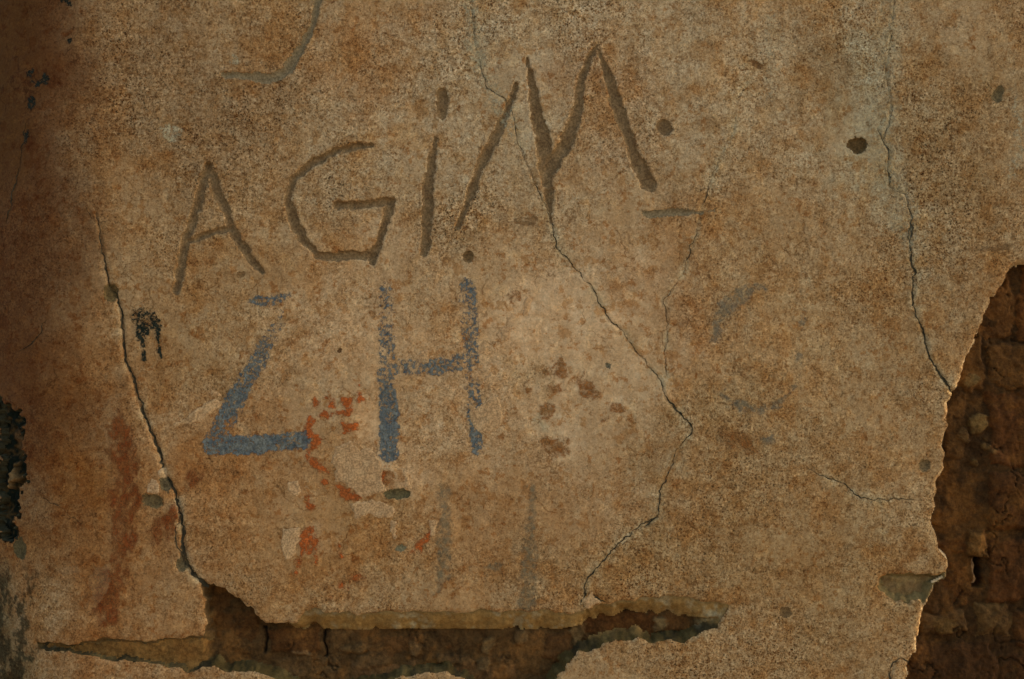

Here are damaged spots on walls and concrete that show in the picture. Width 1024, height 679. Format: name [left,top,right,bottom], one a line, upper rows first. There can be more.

flaking render [0,396,30,560]
crack [85,206,209,588]
flaking render [37,583,729,679]
crack [472,12,693,611]
crack [806,467,914,525]
crack [877,73,952,393]
flaking render [878,261,1024,679]